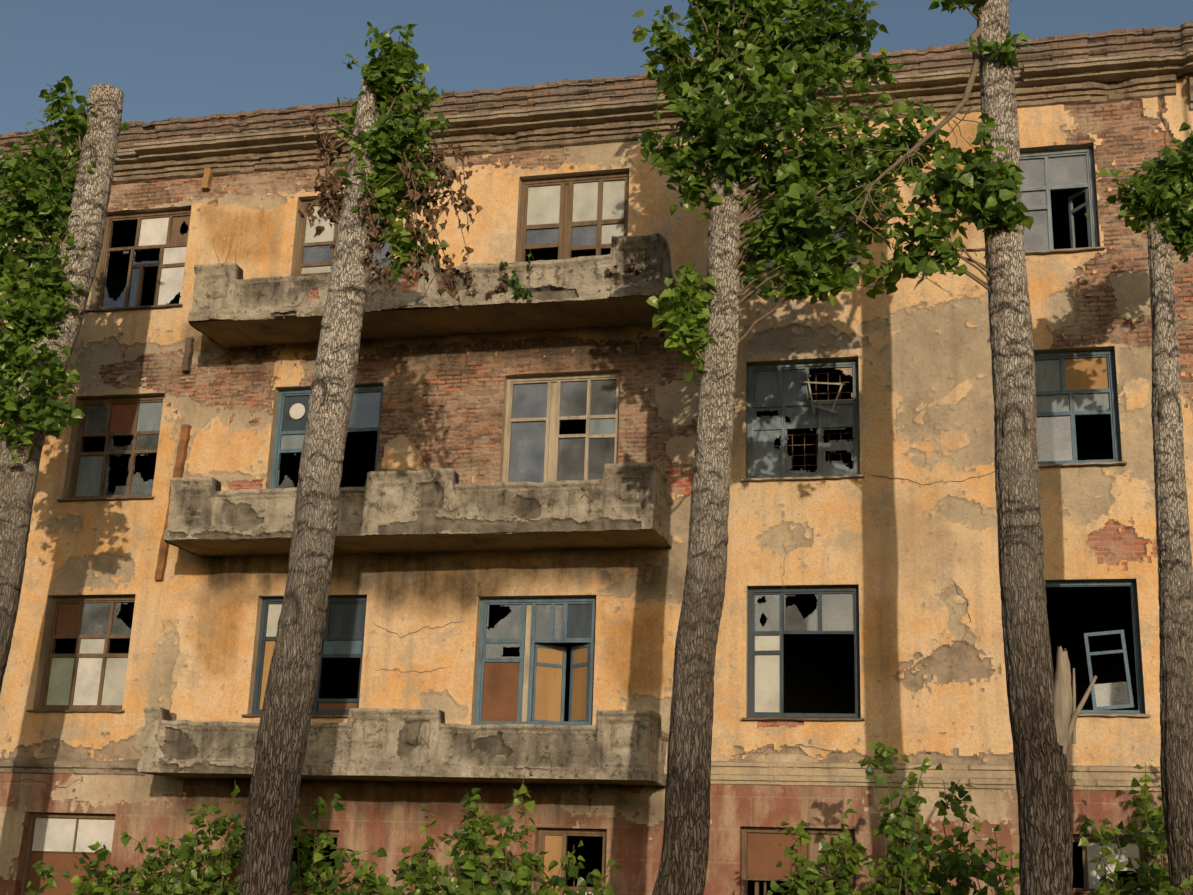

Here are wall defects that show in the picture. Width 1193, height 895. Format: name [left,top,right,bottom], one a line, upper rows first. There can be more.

flaking render [31,512,149,595]
flaking render [61,328,317,540]
flaking render [355,326,701,614]
flaking render [750,504,821,569]
flaking render [741,285,995,479]
flaking render [928,490,997,546]
flaking render [1037,96,1182,571]
flaking render [1171,245,1193,413]
flaking render [396,689,468,760]
spalling [471,730,514,758]
peeling [559,673,673,840]
flaking render [877,583,1002,707]